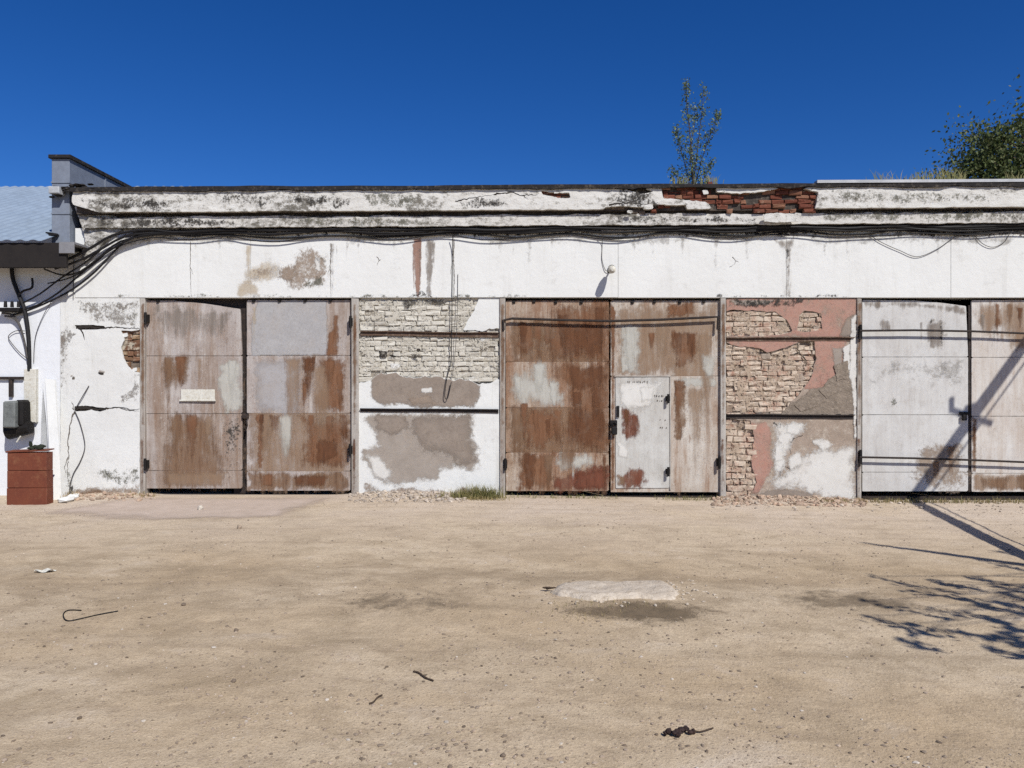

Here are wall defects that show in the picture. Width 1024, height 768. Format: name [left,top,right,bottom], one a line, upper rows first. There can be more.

leakage [82,198,275,244]
leakage [608,189,758,242]
spalling [607,182,817,223]
leakage [239,249,332,295]
corrosion [413,239,421,297]
crack [76,326,139,340]
spalling [80,300,140,402]
corrosion [163,355,201,384]
corrosion [247,307,356,492]
spalling [359,291,500,484]
corrosion [501,301,725,492]
spalling [726,298,857,497]